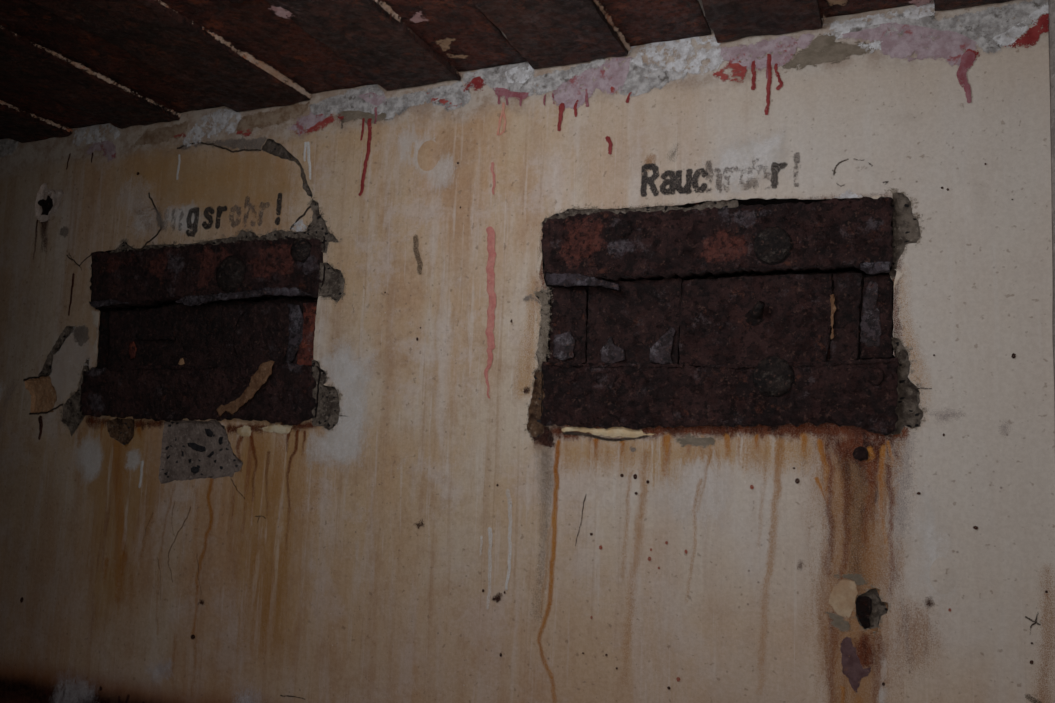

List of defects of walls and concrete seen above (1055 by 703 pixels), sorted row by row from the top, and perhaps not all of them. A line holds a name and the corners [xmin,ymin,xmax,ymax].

peeling [816,0,1049,55]
peeling [308,58,606,121]
peeling [617,35,724,97]
crack [177,139,313,230]
rust [413,234,423,274]
spalling [835,188,924,289]
spalling [106,196,346,484]
rust [175,287,310,307]
rust [510,227,621,415]
rust [528,260,935,703]
spalling [851,585,891,634]
leakage [0,627,520,703]